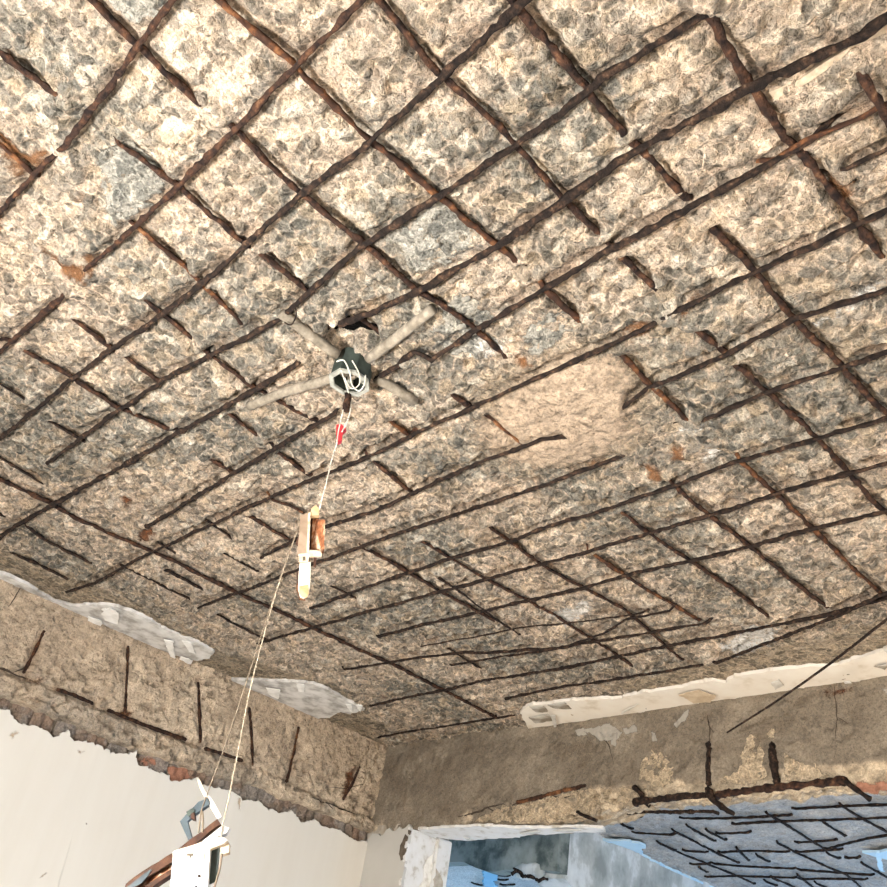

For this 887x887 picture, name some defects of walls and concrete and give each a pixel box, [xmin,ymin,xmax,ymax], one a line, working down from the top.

spalling [109,0,163,24]
corrosion [0,133,47,177]
spalling [96,141,165,226]
corrosion [829,175,855,198]
spalling [385,201,483,272]
corrosion [44,248,97,285]
spalling [431,293,495,360]
corrosion [645,465,661,482]
corrosion [671,447,685,460]
corrosion [137,527,156,542]
peeling [0,570,215,664]
peeling [520,645,887,729]